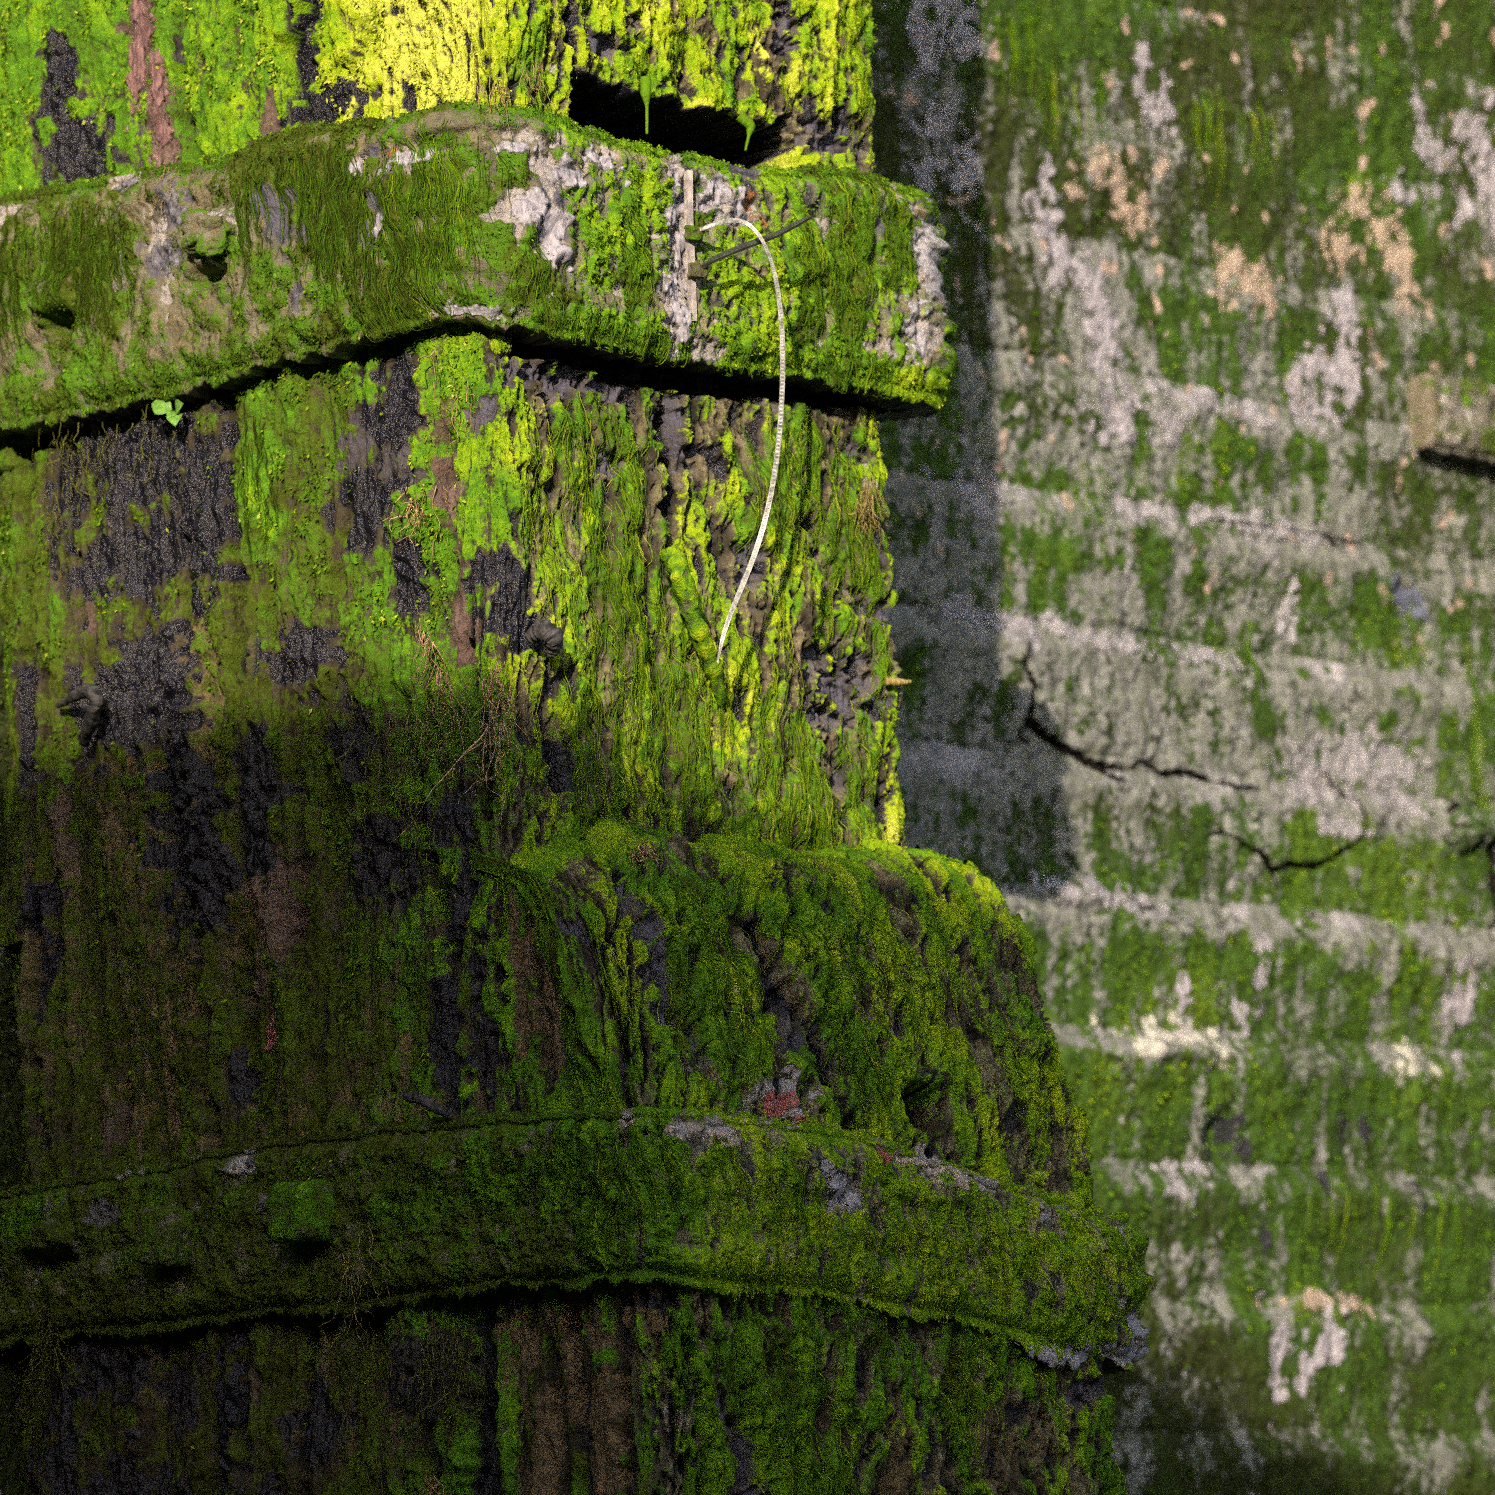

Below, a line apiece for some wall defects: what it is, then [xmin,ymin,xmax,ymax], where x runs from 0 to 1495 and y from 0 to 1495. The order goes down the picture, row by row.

crack [1018,639,1259,790]
damp [1465,643,1495,814]
crack [1207,765,1368,887]
crack [1445,800,1478,812]
crack [1486,842,1495,940]
damp [1167,969,1202,1041]
damp [1232,934,1273,1038]
damp [1393,950,1488,1092]
damp [1268,1294,1349,1414]